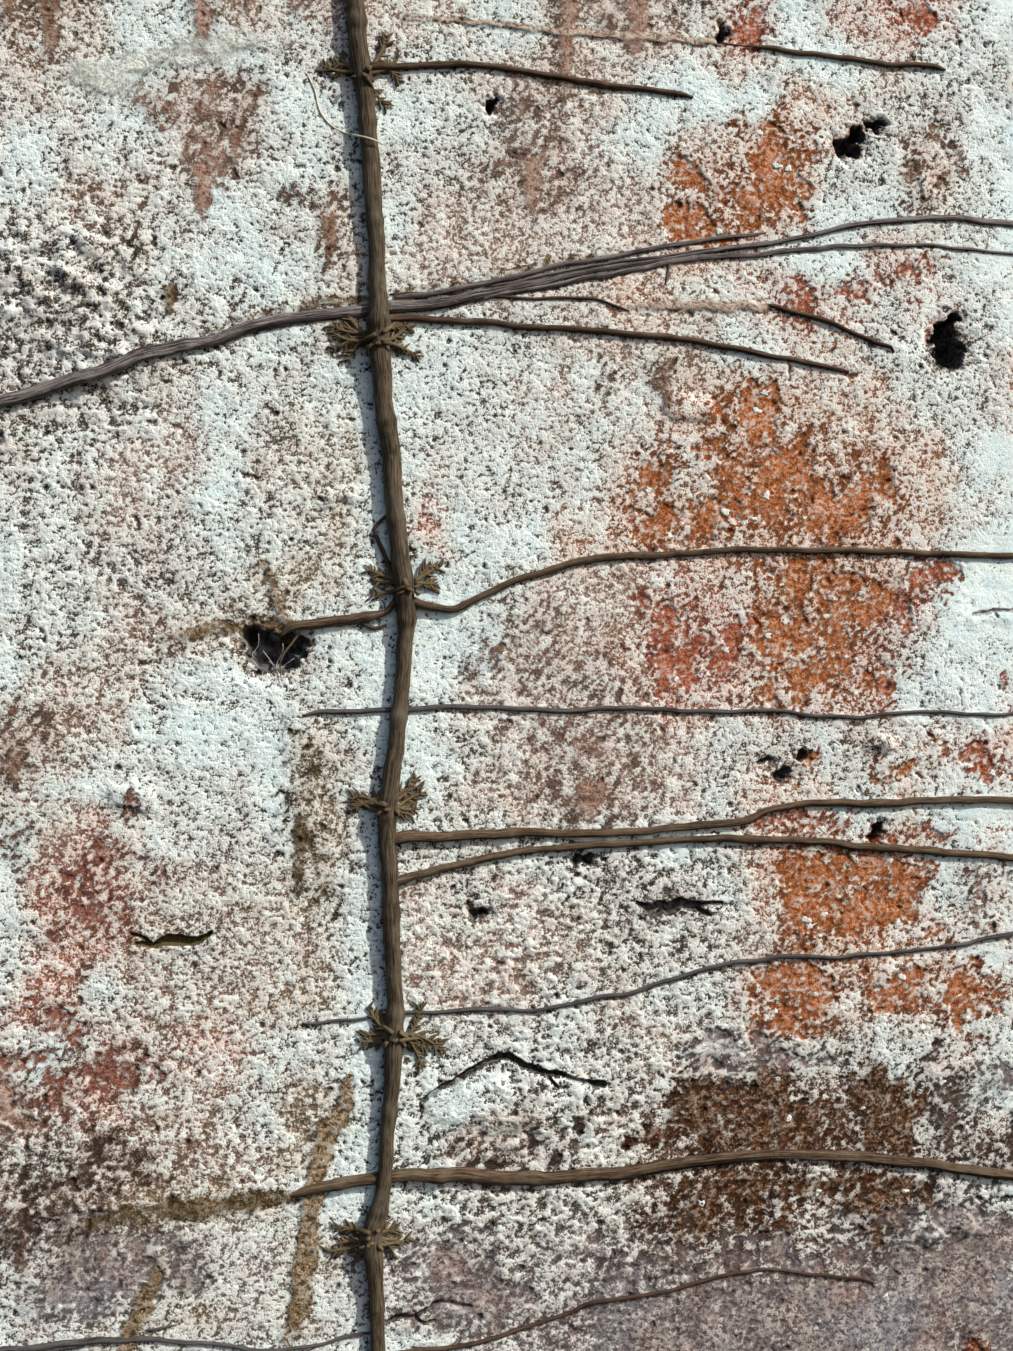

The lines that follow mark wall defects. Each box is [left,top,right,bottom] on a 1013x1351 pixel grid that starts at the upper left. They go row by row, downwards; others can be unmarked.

crack [636,896,723,920]
crack [130,931,213,949]
crack [420,1051,607,1103]